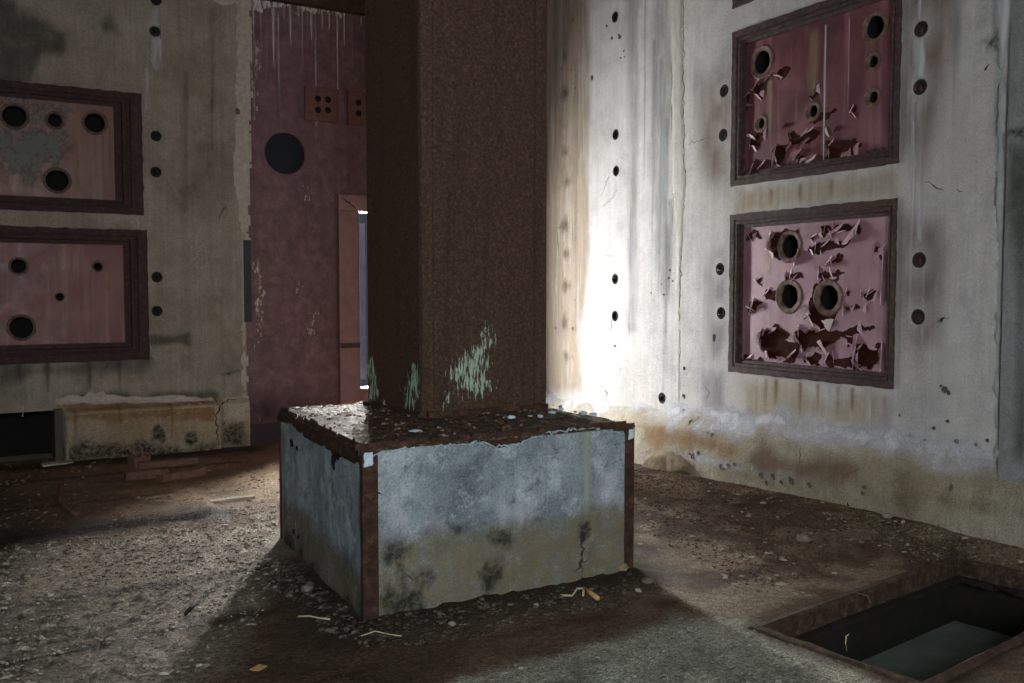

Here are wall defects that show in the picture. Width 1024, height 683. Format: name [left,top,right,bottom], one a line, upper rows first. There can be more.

water stain [252,0,365,110]
peeling [744,66,790,110]
peeling [746,84,862,175]
peeling [744,219,887,370]
water stain [63,425,244,461]
crack [212,398,235,445]
peeling [400,363,422,432]
rust [277,407,635,465]
peeling [443,322,497,409]
water stain [642,398,994,470]
water stain [379,432,624,616]
crack [574,528,592,576]